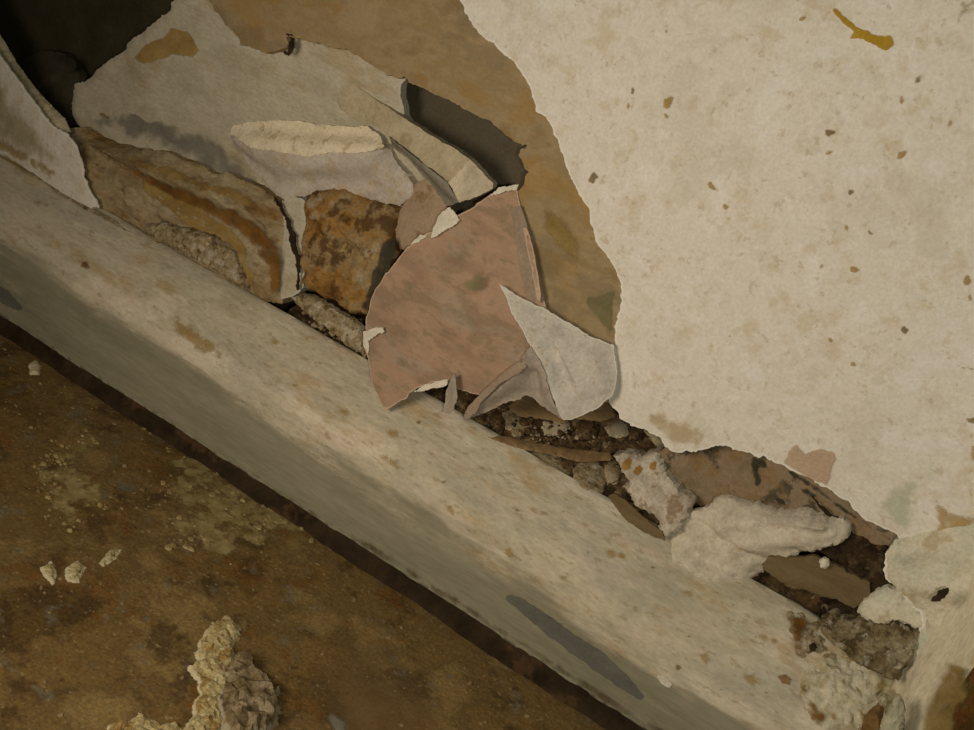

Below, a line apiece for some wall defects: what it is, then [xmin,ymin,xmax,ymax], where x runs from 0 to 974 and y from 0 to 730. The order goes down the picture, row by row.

spalling [0,0,174,81]
spalling [37,89,80,133]
flaking render [17,165,129,232]
spalling [268,299,297,313]
peeling [785,445,836,484]
peeling [608,493,665,541]
peeling [506,595,644,699]
flaking render [778,584,922,730]
peeling [924,655,974,730]